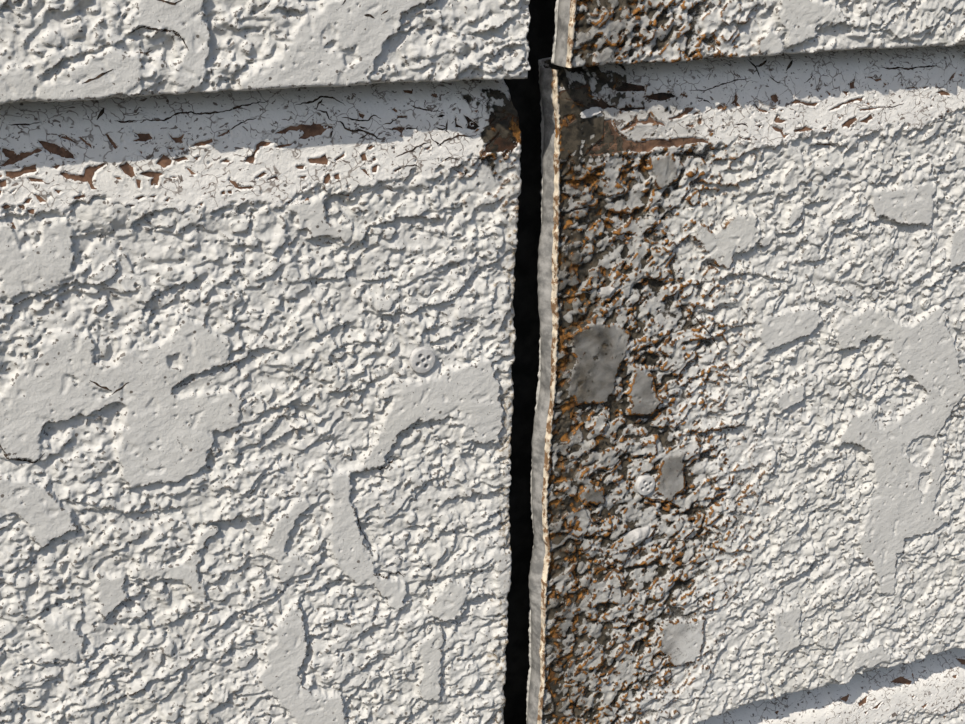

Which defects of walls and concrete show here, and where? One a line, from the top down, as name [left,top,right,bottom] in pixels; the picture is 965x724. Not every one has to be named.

peeling [0,134,105,214]
peeling [115,130,230,207]
peeling [221,172,280,194]
peeling [245,122,332,163]
peeling [296,154,345,201]
peeling [361,145,378,177]
peeling [438,110,520,157]
corrosion [459,88,521,203]
peeling [559,81,725,156]
peeling [755,89,838,146]
peeling [829,81,882,128]
corrosion [542,0,770,724]